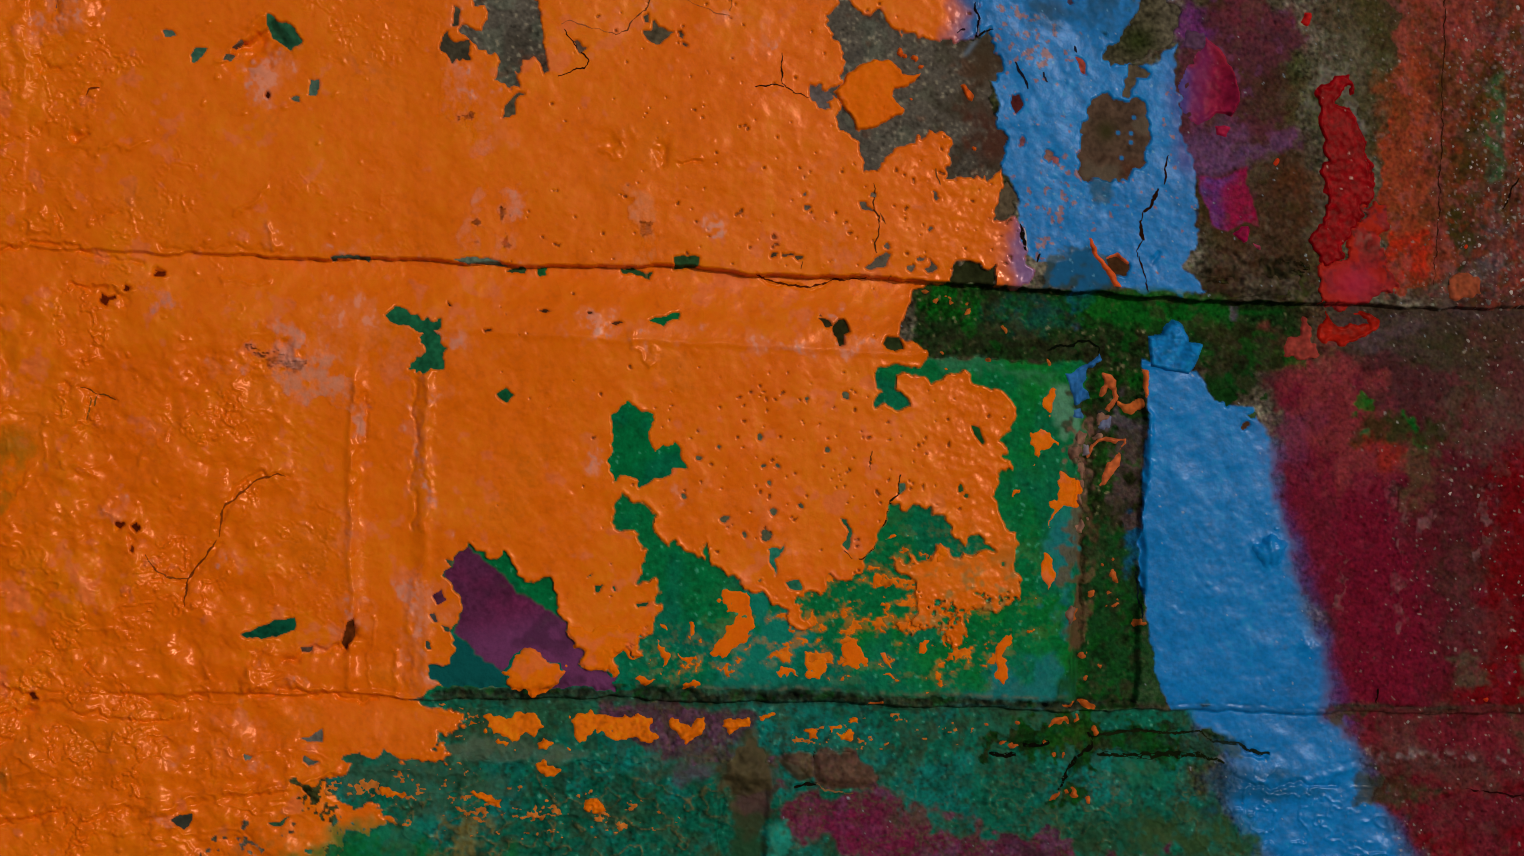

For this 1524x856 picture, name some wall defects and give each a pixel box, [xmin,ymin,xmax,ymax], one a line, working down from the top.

spalling [267,14,302,50]
peeling [440,0,589,117]
peeling [810,0,1025,220]
peeling [1075,0,1240,182]
crack [1136,155,1169,292]
peeling [455,257,547,276]
peeling [674,256,699,269]
peeling [907,257,995,315]
peeling [1089,238,1129,287]
peeling [386,303,451,373]
peeling [293,318,1203,839]
crack [989,728,1270,790]